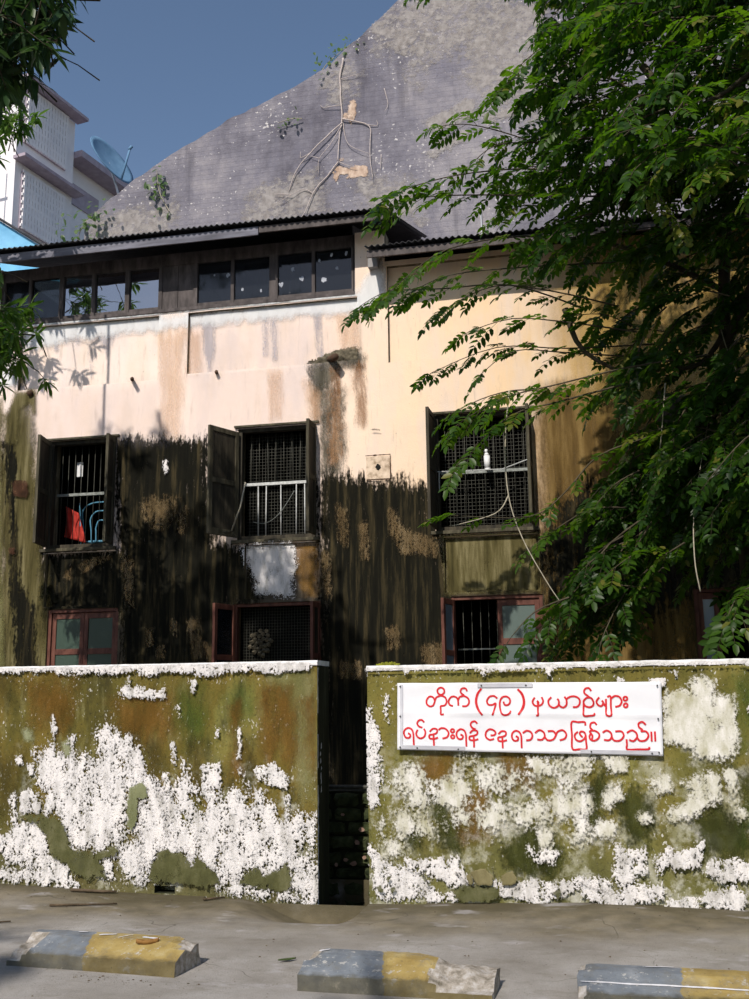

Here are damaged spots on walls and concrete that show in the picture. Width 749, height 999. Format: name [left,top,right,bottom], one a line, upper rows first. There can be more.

peeling [322,59,359,124]
peeling [371,0,519,91]
flaking render [333,159,368,182]
water stain [0,403,264,667]
water stain [308,245,741,788]
peeling [365,661,749,823]
peeling [0,714,322,905]
water stain [462,789,487,837]
water stain [500,826,564,879]
peeling [334,694,749,911]
water stain [577,767,609,833]
water stain [692,765,749,861]